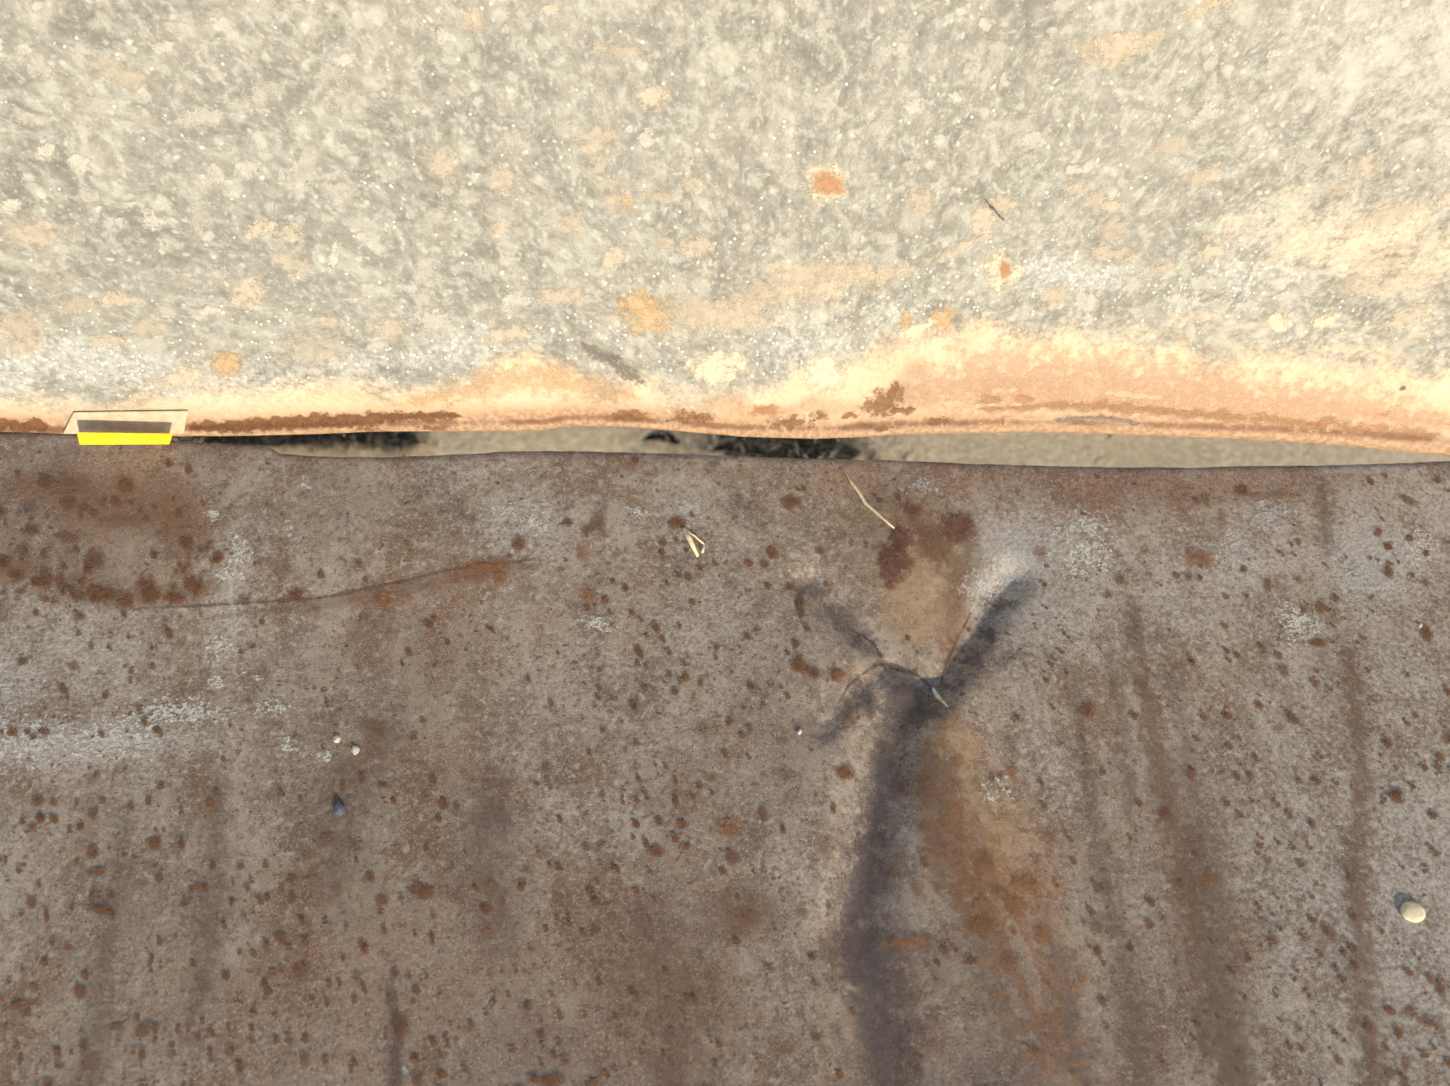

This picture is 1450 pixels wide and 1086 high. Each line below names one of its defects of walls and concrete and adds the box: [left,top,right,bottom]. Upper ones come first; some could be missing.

leakage [616,260,910,393]
leakage [801,351,848,401]
leakage [890,305,958,346]
leakage [950,505,1125,668]
corrosion [0,409,1450,1086]
leakage [977,771,1013,805]
leakage [821,682,963,1086]